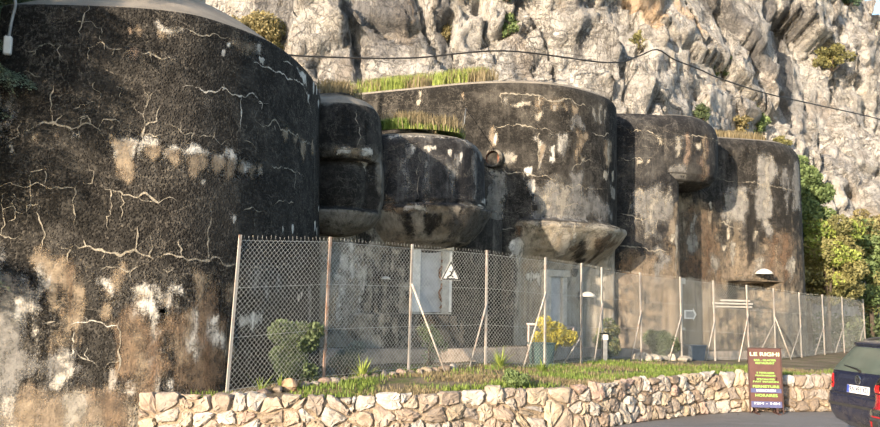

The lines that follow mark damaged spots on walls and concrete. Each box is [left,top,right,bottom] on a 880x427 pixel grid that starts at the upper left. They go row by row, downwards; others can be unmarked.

crack [8,4,313,147]
crack [0,169,288,278]
leakage [110,135,261,184]
crack [245,165,303,227]
leakage [524,113,612,266]
leakage [718,141,801,285]
leakage [0,248,137,427]
crack [47,320,121,374]
leakage [132,282,173,310]